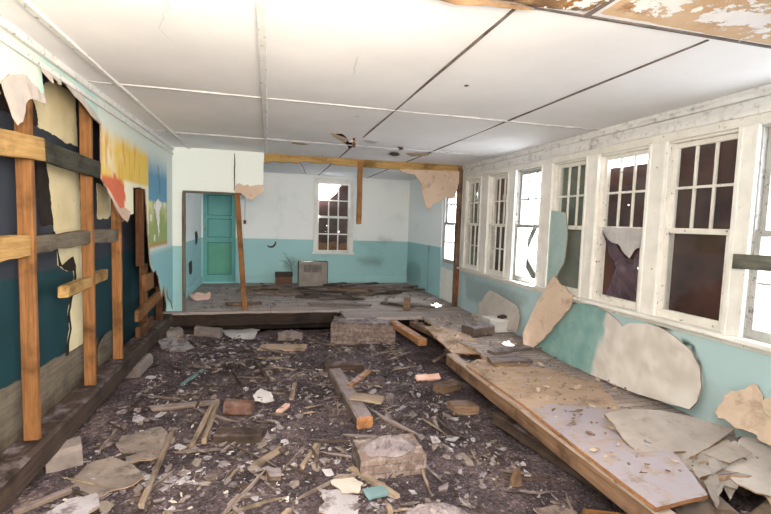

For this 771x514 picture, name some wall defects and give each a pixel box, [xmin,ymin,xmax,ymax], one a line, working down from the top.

water stain [502,0,605,11]
peeling [557,0,771,45]
peeling [27,83,47,103]
peeling [150,199,165,241]